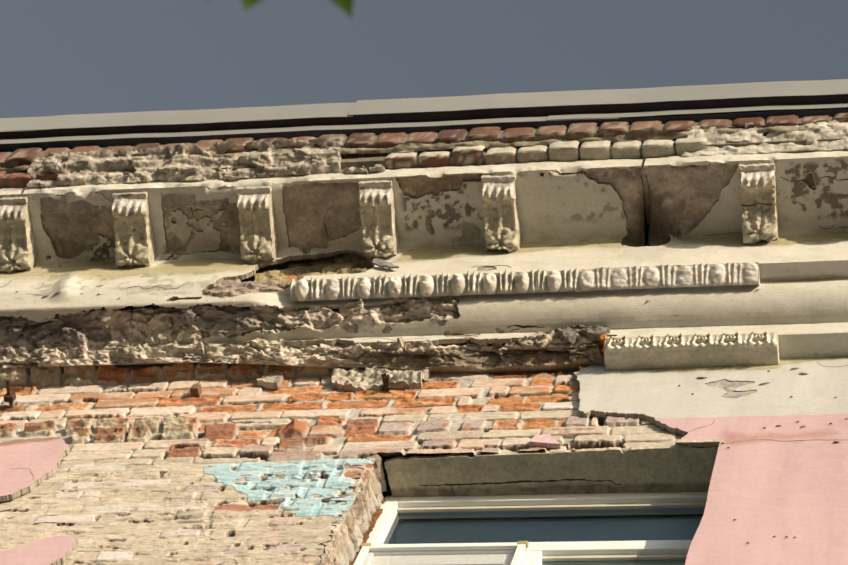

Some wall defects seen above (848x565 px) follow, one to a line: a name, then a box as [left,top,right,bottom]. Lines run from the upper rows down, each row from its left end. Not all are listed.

flaking render [397,174,482,198]
flaking render [540,119,848,247]
crack [781,176,848,191]
flaking render [161,193,241,256]
flaking render [426,210,436,235]
flaking render [203,182,374,298]
spalling [437,317,480,345]
flaking render [555,325,611,343]
flaking render [699,377,770,398]
spalling [0,358,684,565]
crack [420,479,622,496]